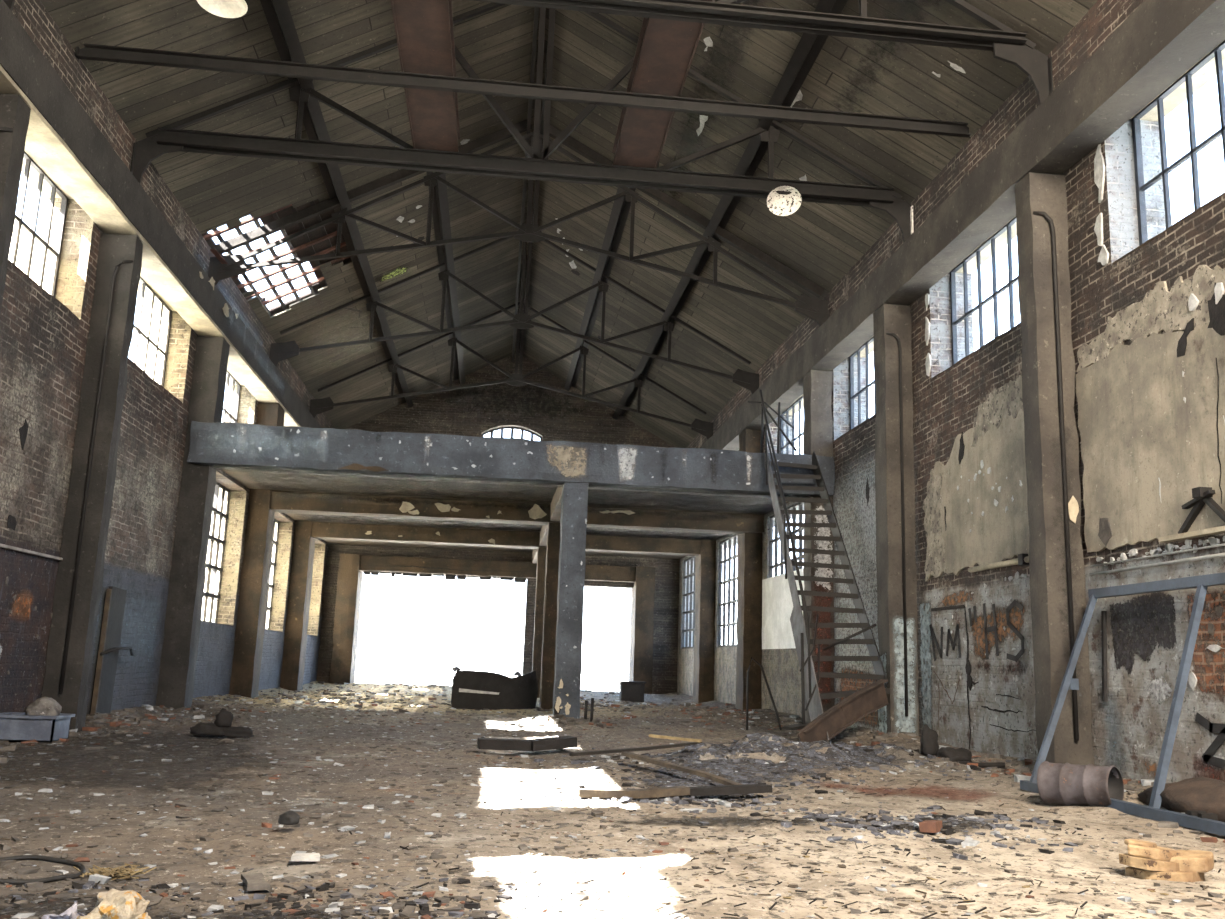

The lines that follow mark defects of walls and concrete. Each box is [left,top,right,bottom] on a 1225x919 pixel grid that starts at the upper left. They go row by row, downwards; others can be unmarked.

peeling [1094,144,1109,266]
spalling [1077,265,1225,377]
spalling [957,375,1023,516]
spalling [923,468,947,582]
peeling [1096,518,1225,566]
spalling [1187,590,1225,696]